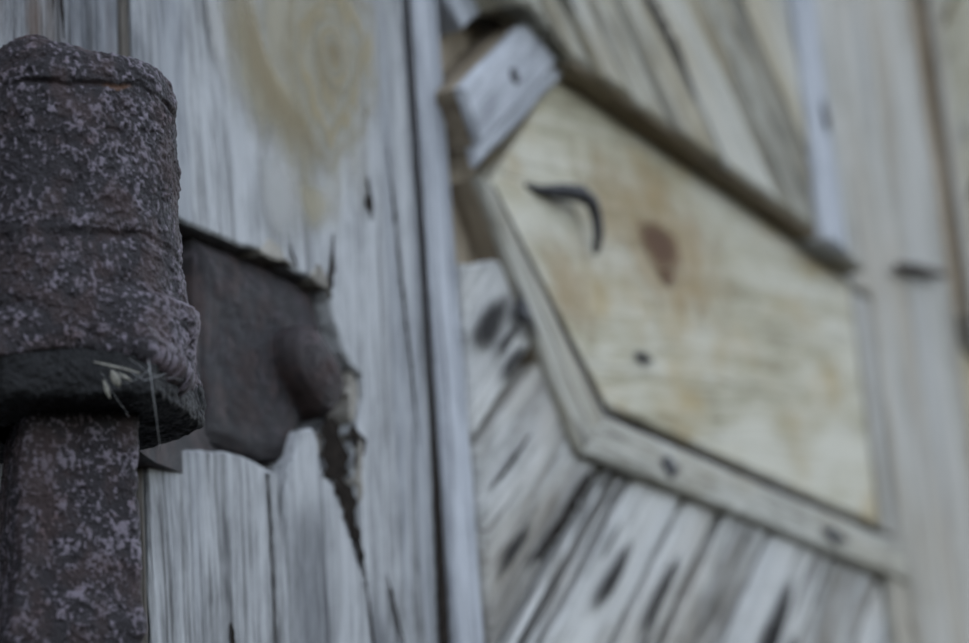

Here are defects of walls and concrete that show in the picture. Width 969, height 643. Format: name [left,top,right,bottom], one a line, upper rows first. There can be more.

peeling [236,238,293,269]
peeling [327,372,364,503]